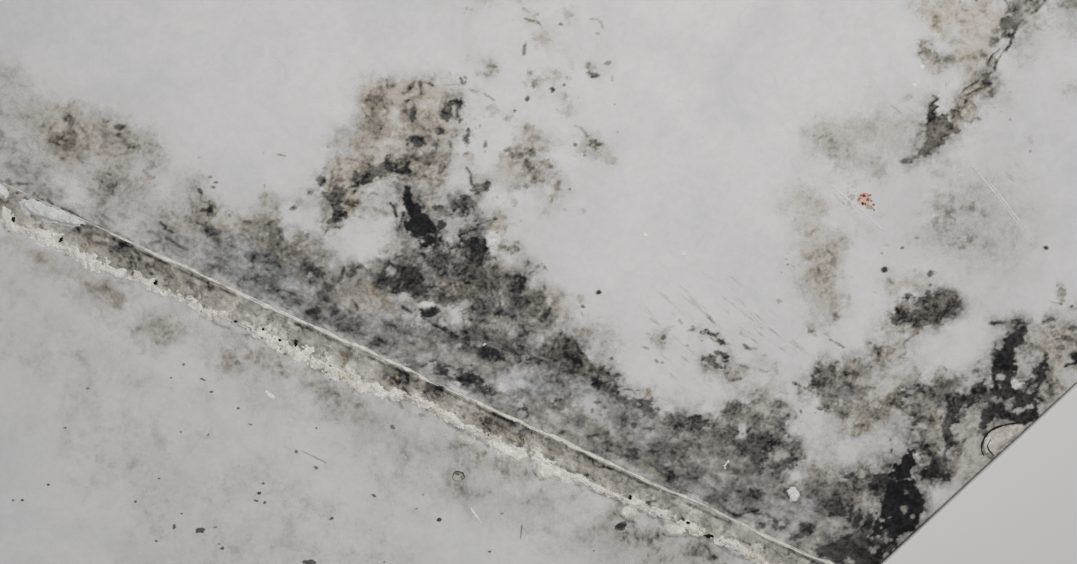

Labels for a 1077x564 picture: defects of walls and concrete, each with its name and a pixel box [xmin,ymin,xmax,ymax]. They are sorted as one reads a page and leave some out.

damp [483,61,499,77]
damp [522,7,549,56]
damp [586,61,611,78]
damp [917,0,985,74]
damp [1017,0,1077,46]
damp [573,127,616,164]
damp [804,118,885,178]
damp [0,71,598,352]
damp [931,185,1015,256]
damp [800,224,846,325]
damp [200,316,559,511]
damp [335,283,1077,564]